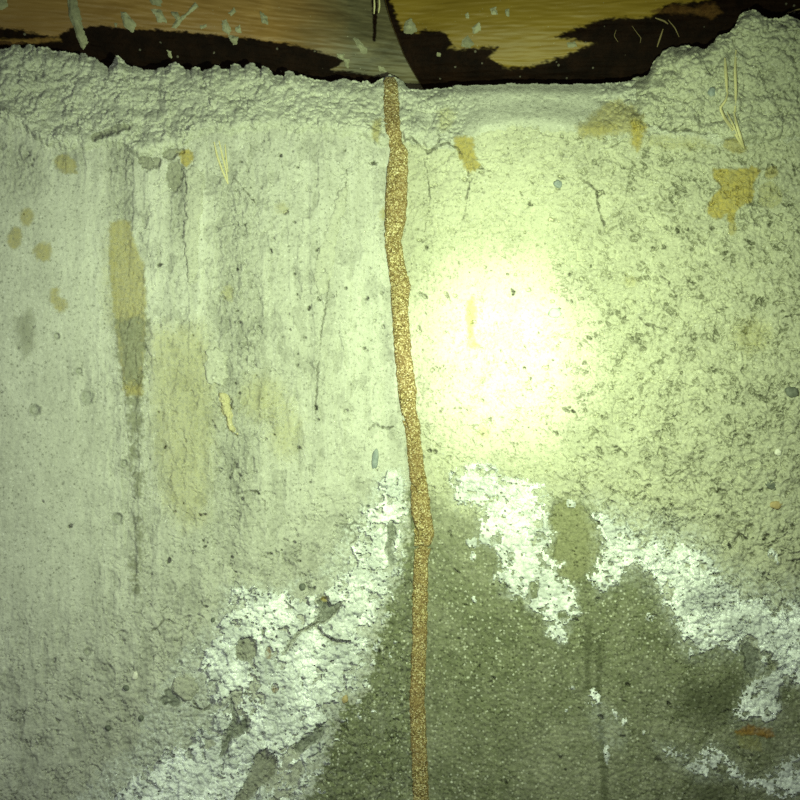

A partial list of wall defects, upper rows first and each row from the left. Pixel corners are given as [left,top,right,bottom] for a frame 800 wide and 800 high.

leakage [110,221,150,460]
leakage [77,463,800,800]